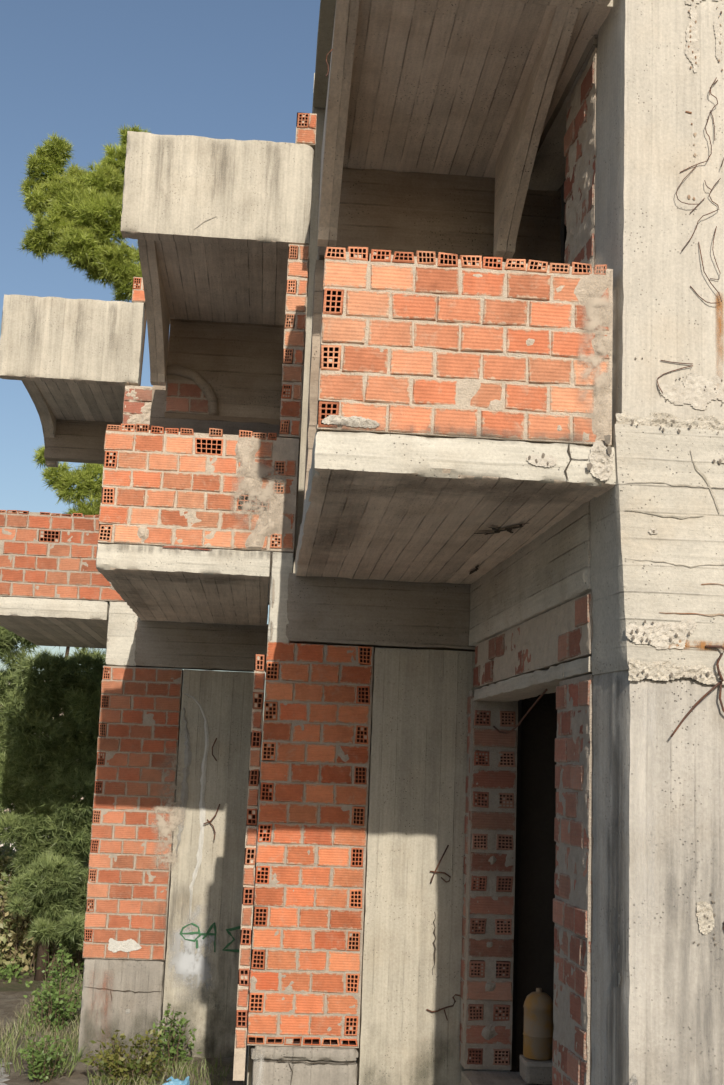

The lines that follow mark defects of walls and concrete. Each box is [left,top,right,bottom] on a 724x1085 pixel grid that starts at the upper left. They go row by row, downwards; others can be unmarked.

crack [474,523,528,535]
spalling [626,619,697,649]